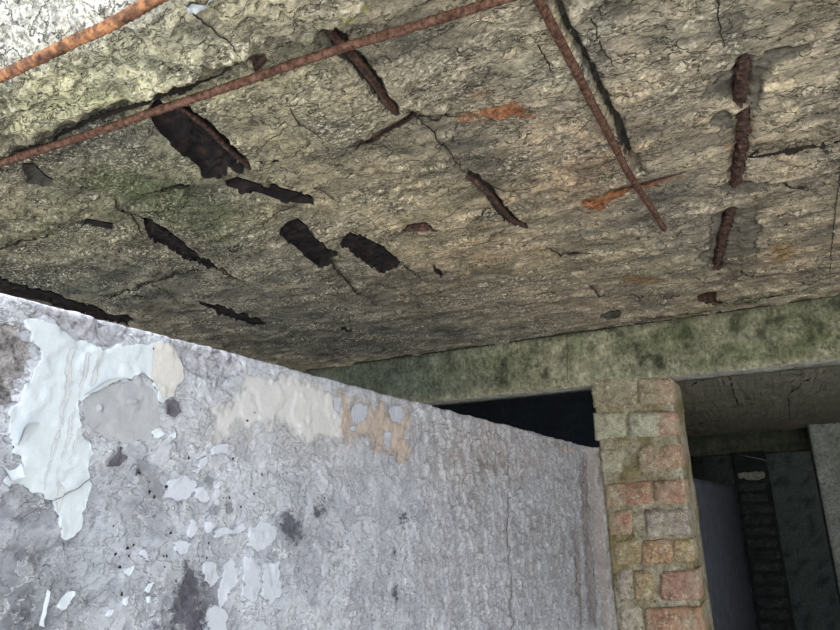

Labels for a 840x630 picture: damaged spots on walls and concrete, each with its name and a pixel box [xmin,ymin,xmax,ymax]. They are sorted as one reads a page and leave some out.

rust [248,56,267,72]
spalling [0,0,517,206]
rust [458,102,536,122]
spalling [466,170,528,229]
rust [582,175,682,211]
spalling [280,219,401,274]
peeling [0,277,369,541]
peeling [383,405,404,450]
peeling [118,544,151,576]
peeling [39,590,75,627]
peeling [105,591,129,617]